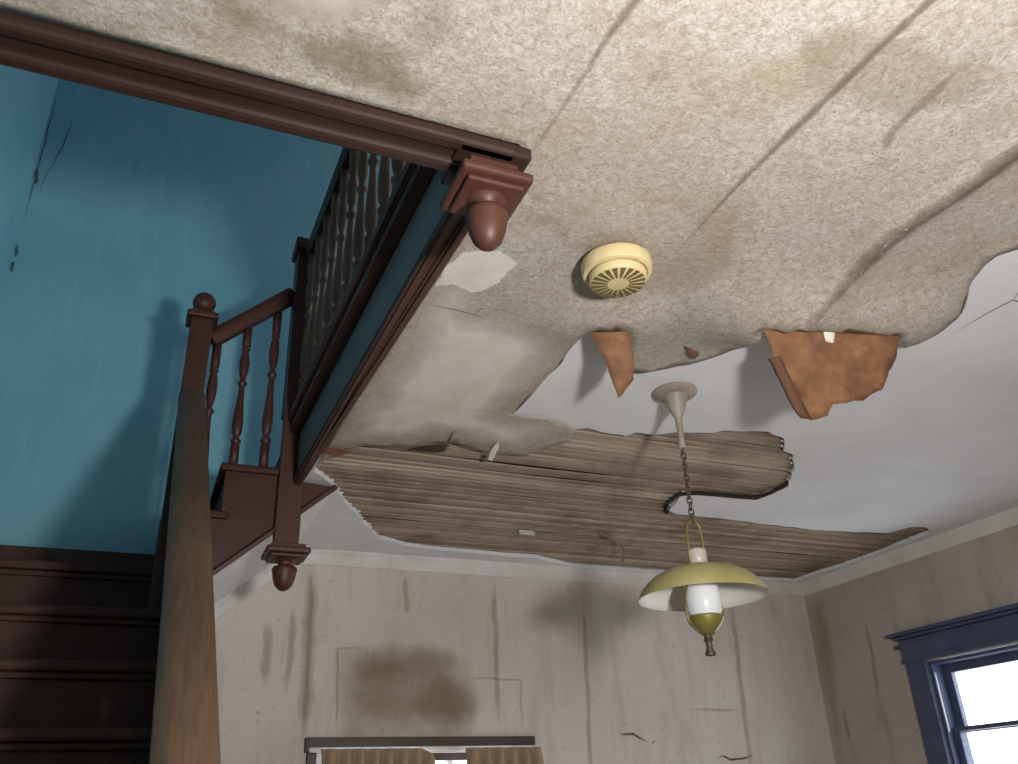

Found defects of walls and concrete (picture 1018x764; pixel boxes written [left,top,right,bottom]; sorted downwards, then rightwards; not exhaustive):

spalling [315,250,928,578]
crack [953,292,1018,333]